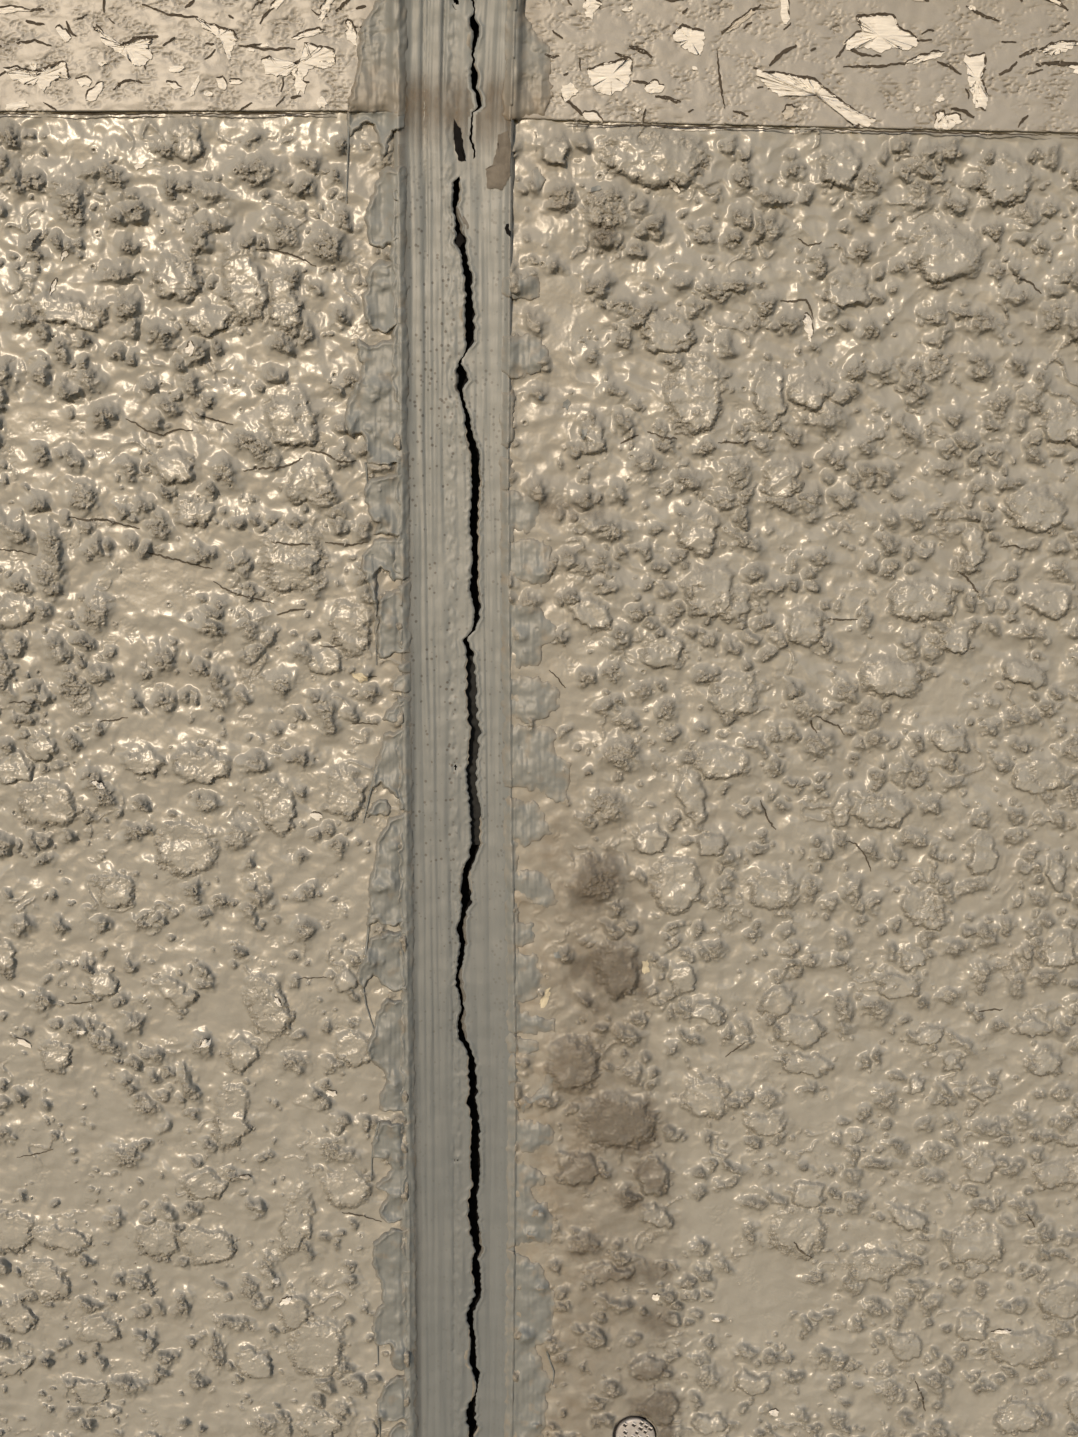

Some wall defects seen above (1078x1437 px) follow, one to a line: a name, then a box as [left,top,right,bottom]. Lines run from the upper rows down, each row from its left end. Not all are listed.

peeling [0,0,175,112]
peeling [142,0,366,116]
peeling [567,0,602,19]
peeling [561,45,732,131]
peeling [668,0,761,116]
peeling [780,0,791,30]
peeling [753,44,876,134]
peeling [836,0,1078,135]
crack [453,0,511,1437]